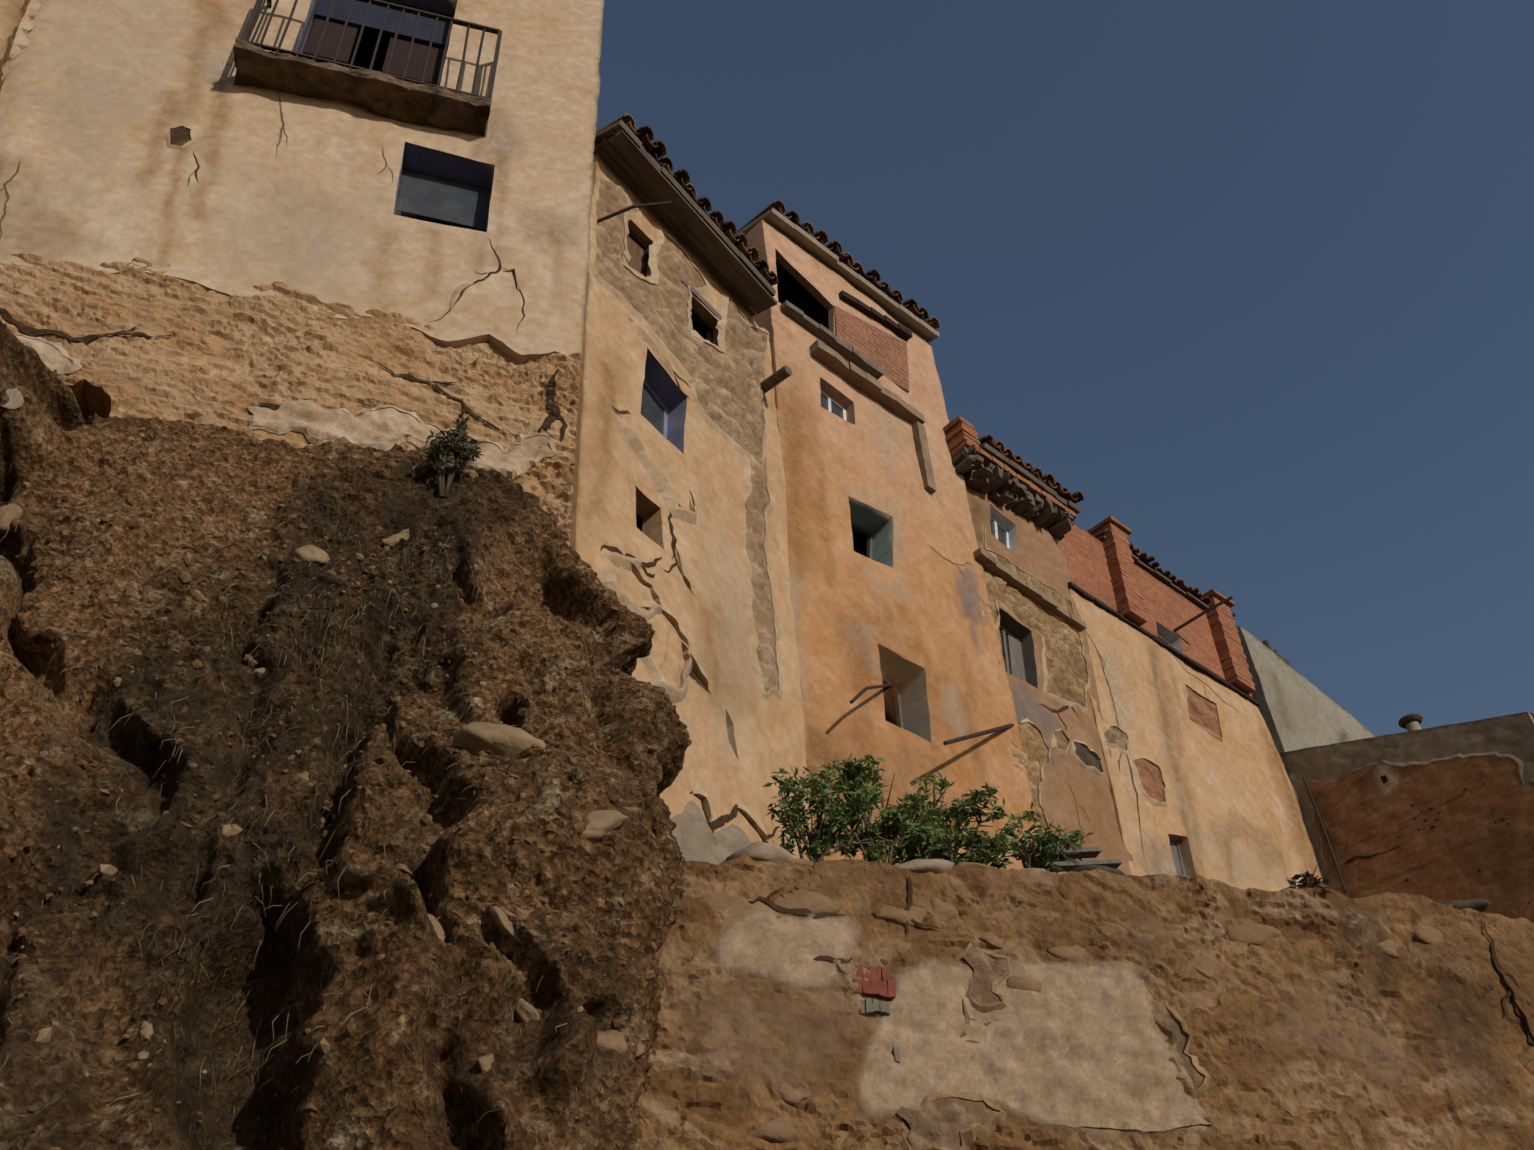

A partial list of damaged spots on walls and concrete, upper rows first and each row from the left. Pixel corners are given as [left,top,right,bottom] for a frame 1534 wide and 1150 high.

crack [0,0,41,90]
crack [0,157,22,239]
spalling [1,320,82,374]
crack [0,308,178,344]
crack [431,239,526,332]
spalling [244,399,558,480]
crack [377,361,568,448]
flaking render [588,178,783,703]
crack [601,405,697,595]
flaking render [971,516,1090,713]
flaking render [1010,718,1167,861]
flaking render [859,942,1213,1150]